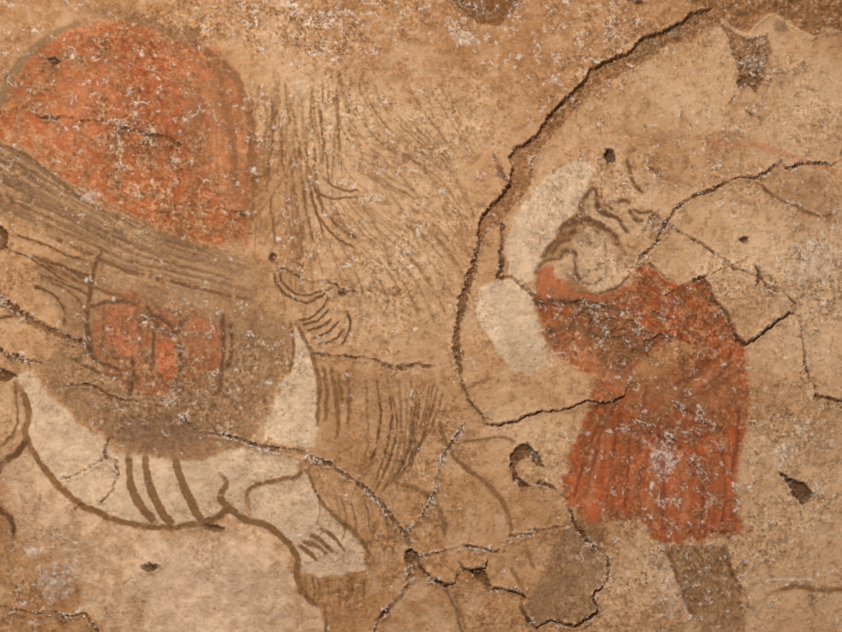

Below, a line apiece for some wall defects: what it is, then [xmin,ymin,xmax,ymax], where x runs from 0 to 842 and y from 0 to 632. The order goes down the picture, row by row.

spalling [451,0,519,27]
spalling [687,0,842,94]
crack [34,113,191,152]
crack [313,6,722,375]
spalling [0,225,9,251]
crack [607,159,842,401]
crack [0,292,91,348]
crack [0,346,44,367]
crack [58,434,121,518]
spalling [775,469,816,506]
crack [180,412,612,632]
crack [0,600,109,632]